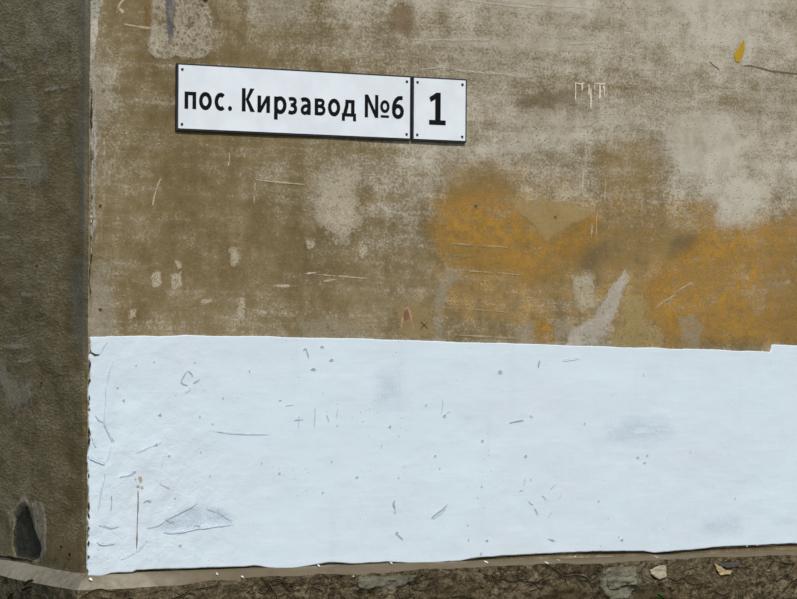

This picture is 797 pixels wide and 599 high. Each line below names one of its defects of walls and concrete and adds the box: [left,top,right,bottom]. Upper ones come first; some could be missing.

flaking render [574,275,595,307]